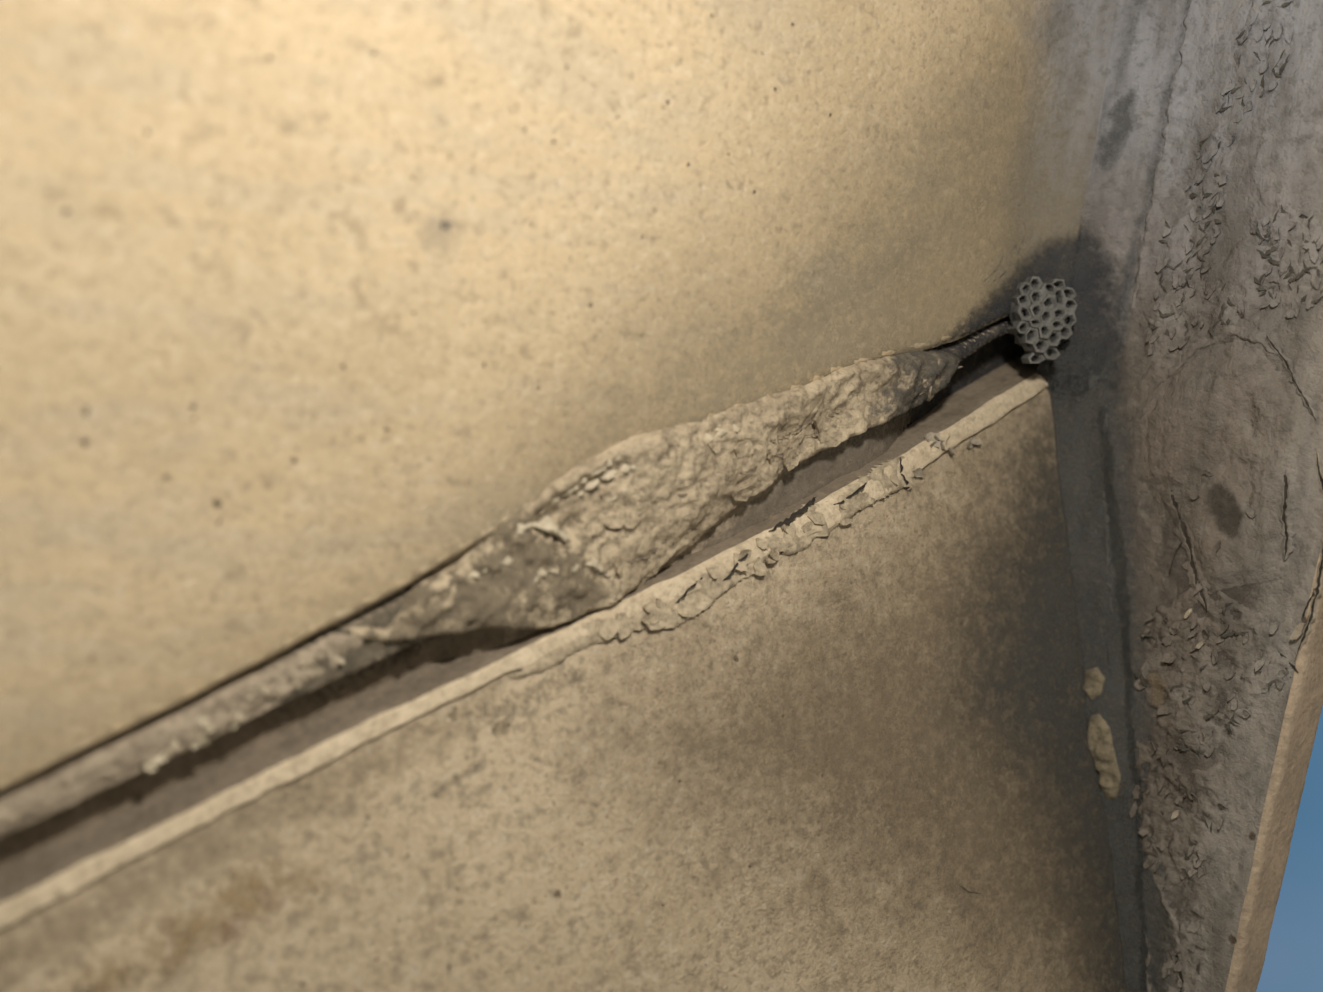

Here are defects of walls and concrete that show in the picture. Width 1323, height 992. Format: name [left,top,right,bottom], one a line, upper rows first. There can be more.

spalling [0,349,963,834]
flaking render [924,432,983,455]
crack [1164,479,1210,611]
spalling [1190,470,1256,552]
crack [1267,334,1323,664]
flaking render [1083,577,1308,992]